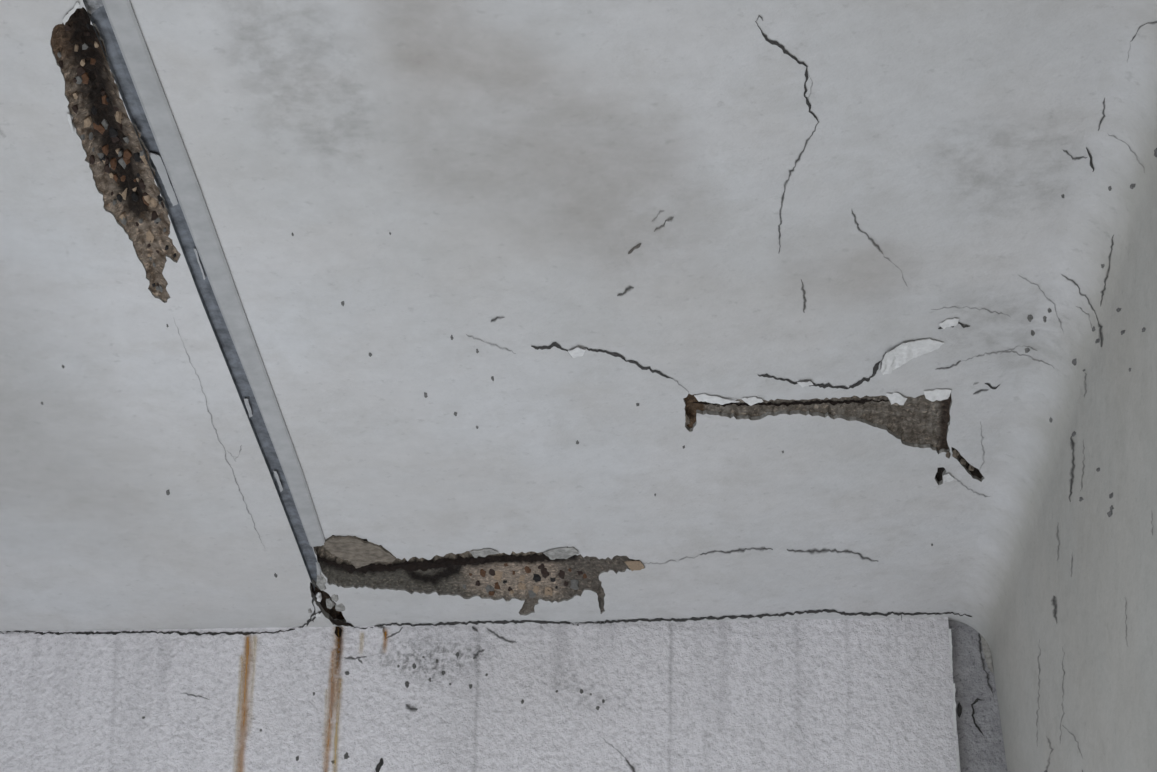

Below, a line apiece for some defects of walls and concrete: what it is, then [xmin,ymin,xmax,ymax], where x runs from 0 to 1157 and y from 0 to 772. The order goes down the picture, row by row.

spalling [50,2,206,303]
crack [755,15,820,252]
crack [507,342,678,382]
crack [758,361,881,389]
spalling [683,389,985,496]
spalling [313,535,645,616]
crack [669,547,877,561]
rust [239,637,250,729]
rust [307,562,353,763]